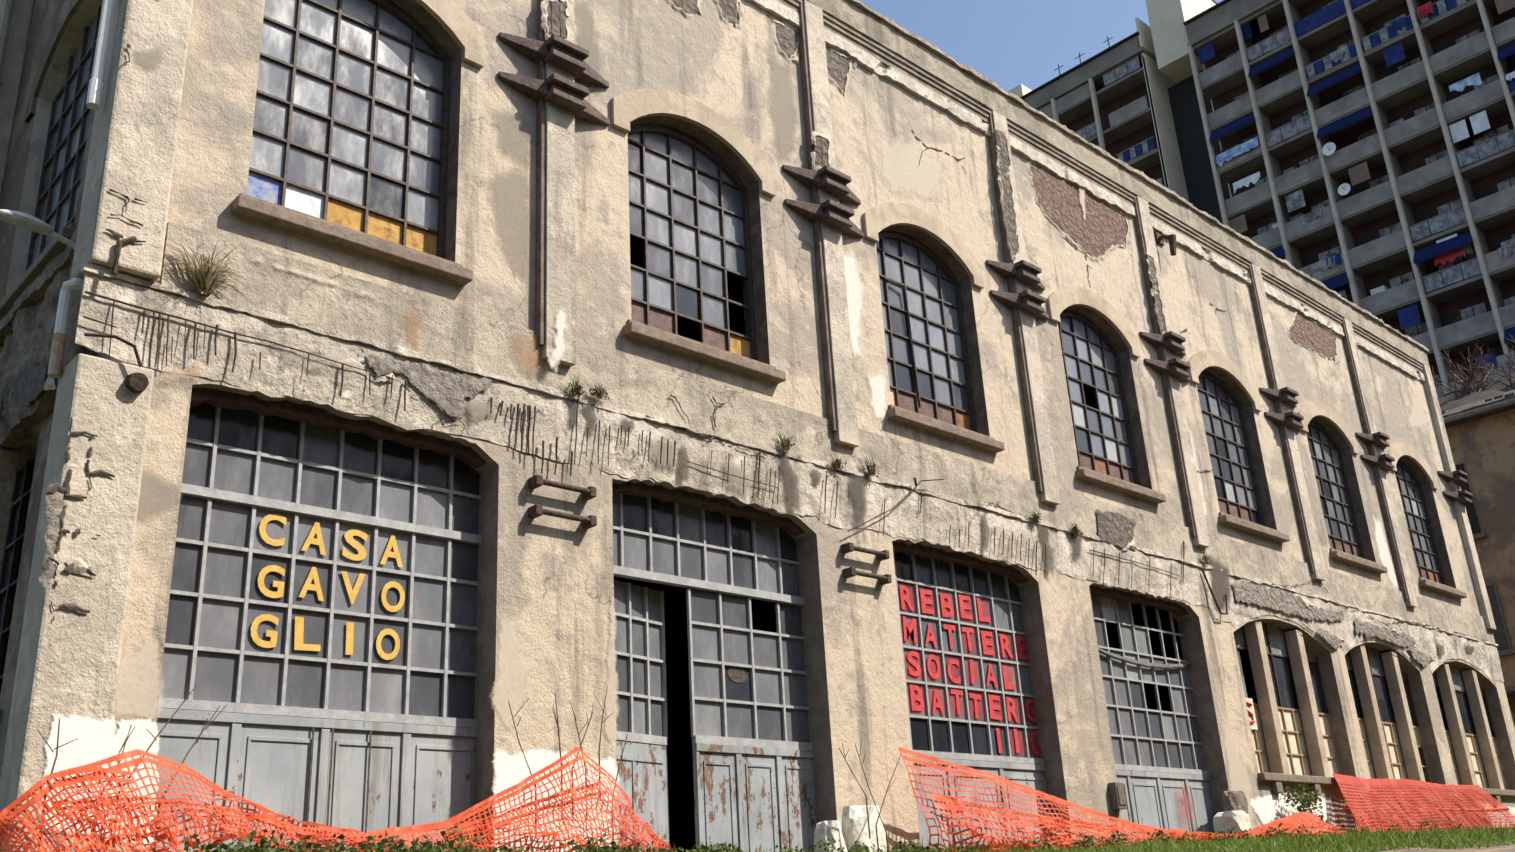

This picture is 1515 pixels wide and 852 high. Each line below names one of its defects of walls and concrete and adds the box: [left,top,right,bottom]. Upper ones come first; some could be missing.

spalling [664,0,744,30]
spalling [825,44,857,97]
spalling [995,129,1168,333]
spalling [83,291,780,504]
water stain [571,401,597,434]
water stain [650,439,689,481]
water stain [725,461,751,492]
spalling [39,417,115,621]
spalling [1231,581,1438,668]